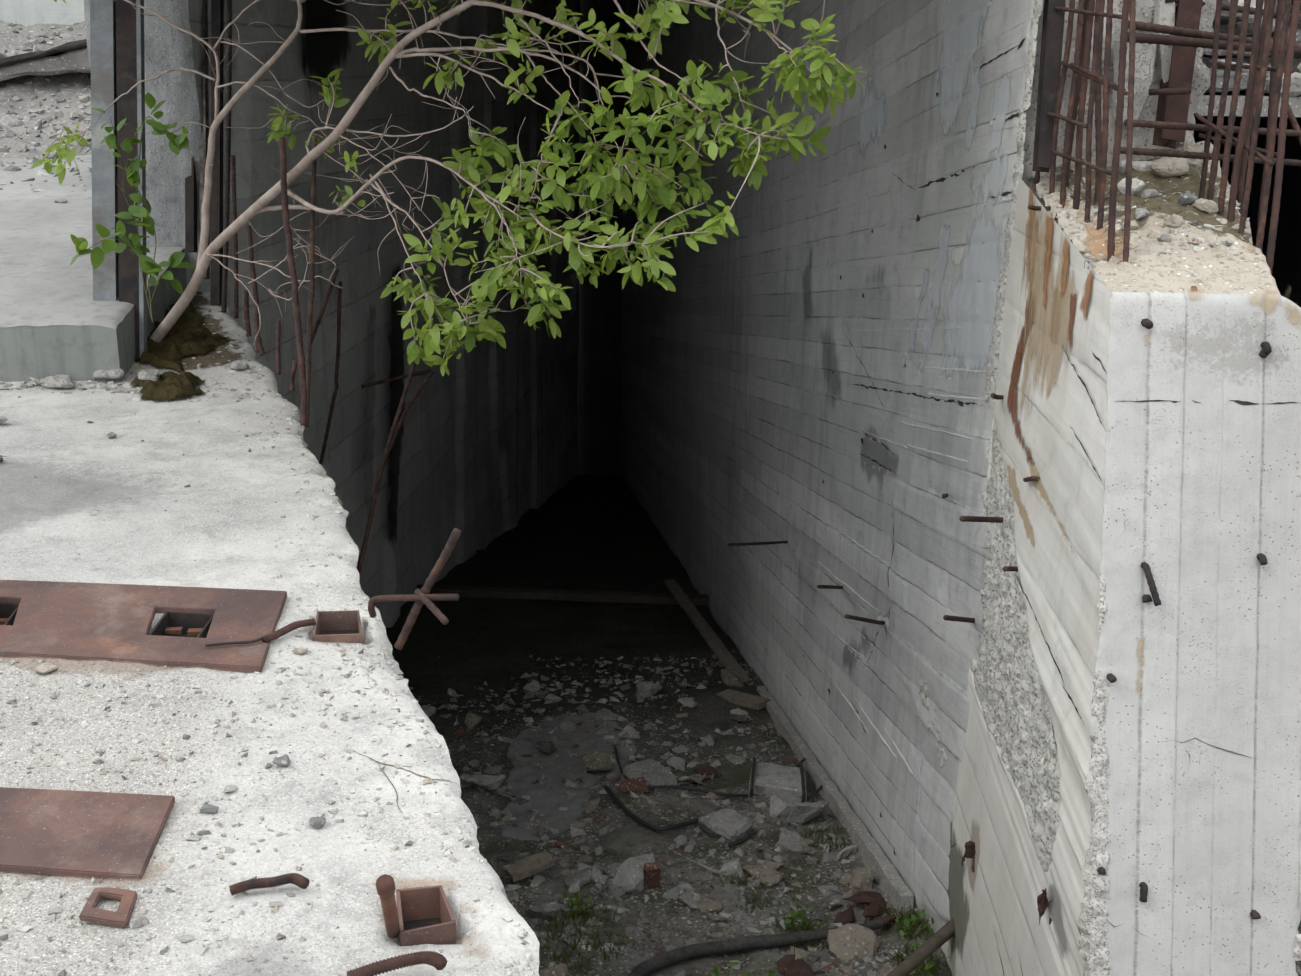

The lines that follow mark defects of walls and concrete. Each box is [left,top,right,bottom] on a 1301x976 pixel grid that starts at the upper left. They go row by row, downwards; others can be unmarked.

spalling [971,0,1061,872]
corrosion [1007,188,1135,545]
spalling [1087,669,1111,976]
spalling [1097,572,1108,632]
crack [1165,738,1254,763]